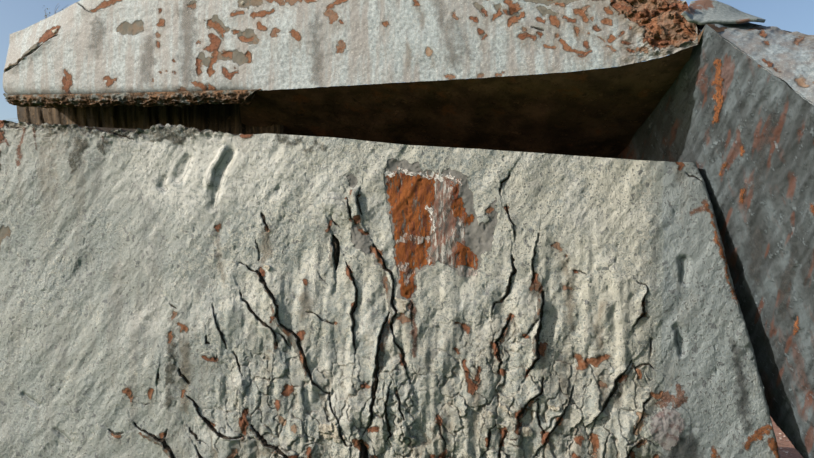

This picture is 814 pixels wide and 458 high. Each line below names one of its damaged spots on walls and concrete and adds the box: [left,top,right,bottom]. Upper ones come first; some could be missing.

corrosion [324,0,347,24]
corrosion [3,8,301,109]
corrosion [0,120,37,166]
peeling [349,219,384,269]
peeling [384,158,498,313]
crack [486,174,515,234]
crack [201,307,243,376]
crack [240,188,413,458]
crack [482,233,574,458]
crack [109,423,175,458]
crack [143,369,311,458]
crack [588,338,654,458]